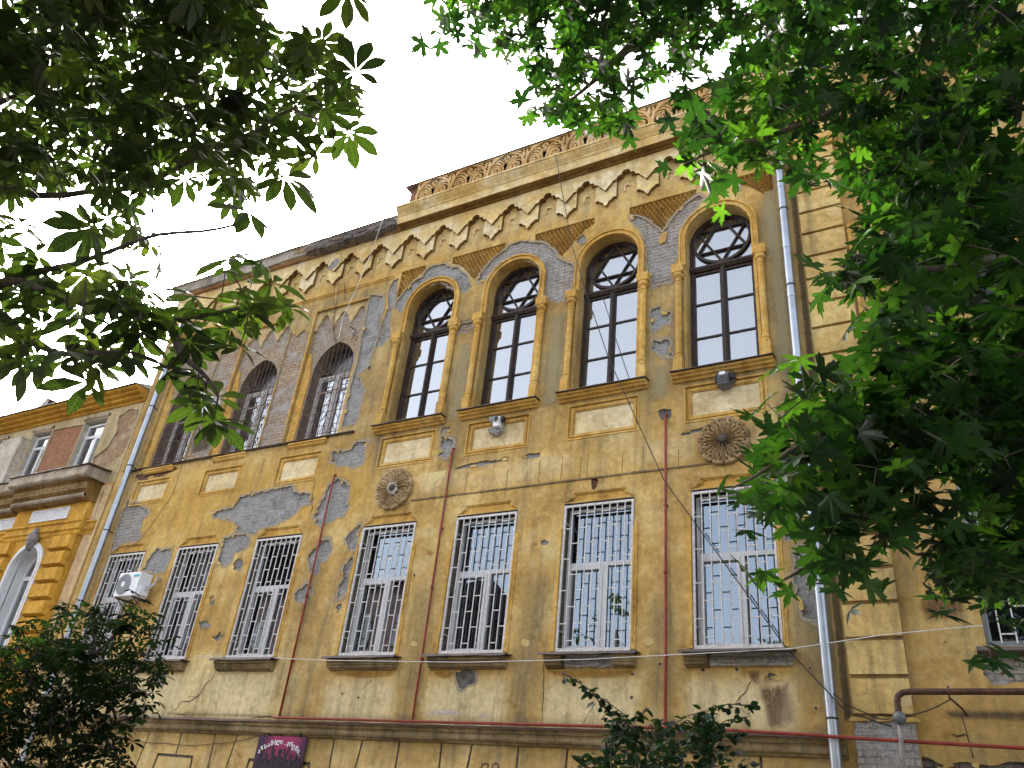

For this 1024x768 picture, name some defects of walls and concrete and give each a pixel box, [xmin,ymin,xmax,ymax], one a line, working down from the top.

spalling [628,194,706,360]
spalling [341,240,575,429]
spalling [437,428,456,460]
flaking render [110,500,150,552]
spalling [209,439,370,612]
spalling [141,544,174,575]
spalling [783,511,818,627]
spalling [454,670,477,692]
leakage [750,672,790,724]